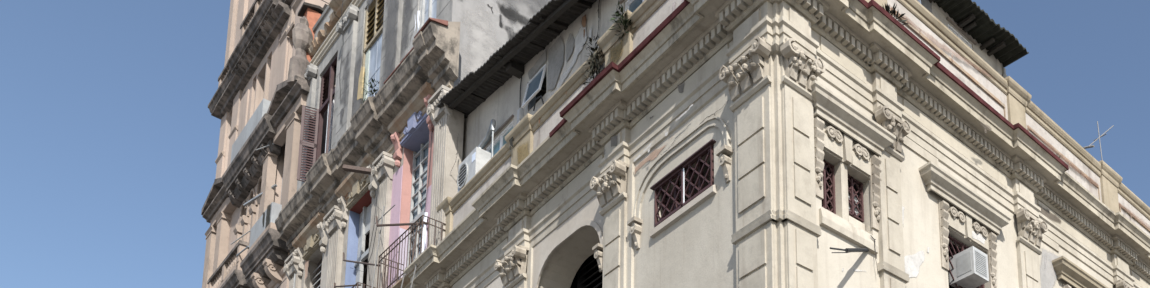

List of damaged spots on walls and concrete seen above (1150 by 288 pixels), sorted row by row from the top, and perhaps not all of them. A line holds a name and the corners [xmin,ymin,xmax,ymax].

leakage [499,0,551,38]